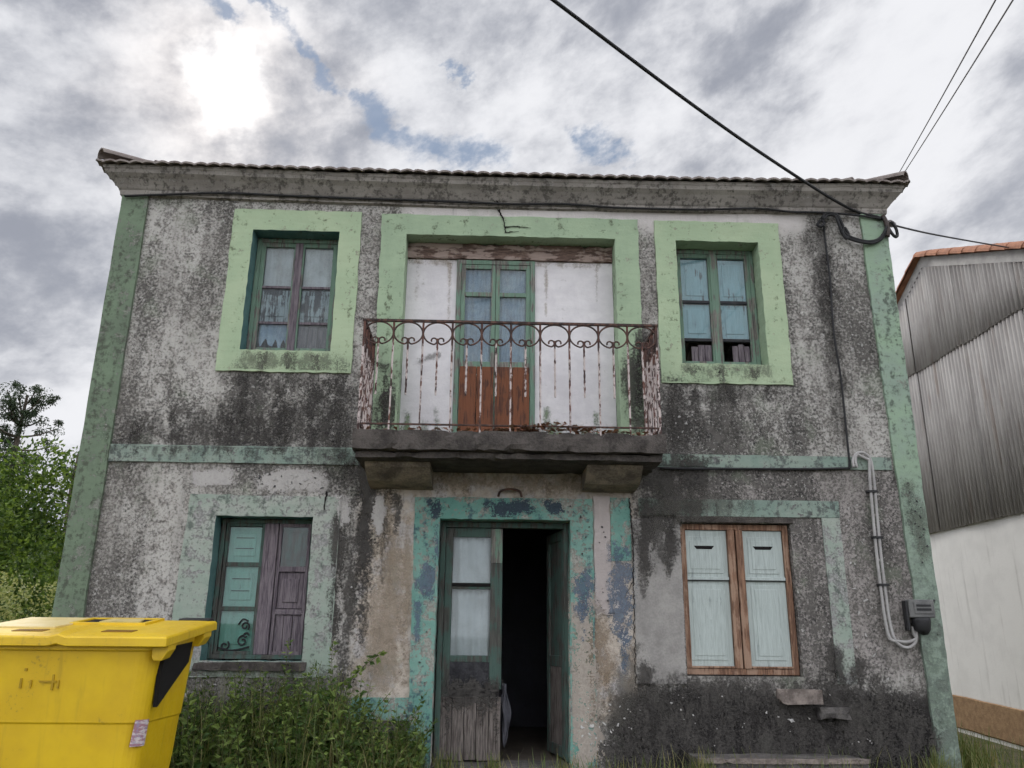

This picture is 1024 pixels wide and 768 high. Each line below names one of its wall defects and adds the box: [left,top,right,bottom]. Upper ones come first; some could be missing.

crack [493,200,528,233]
leakage [328,455,403,687]
peeling [413,498,450,643]
flaking render [483,498,641,768]
leakage [620,329,712,597]
leakage [598,644,943,768]